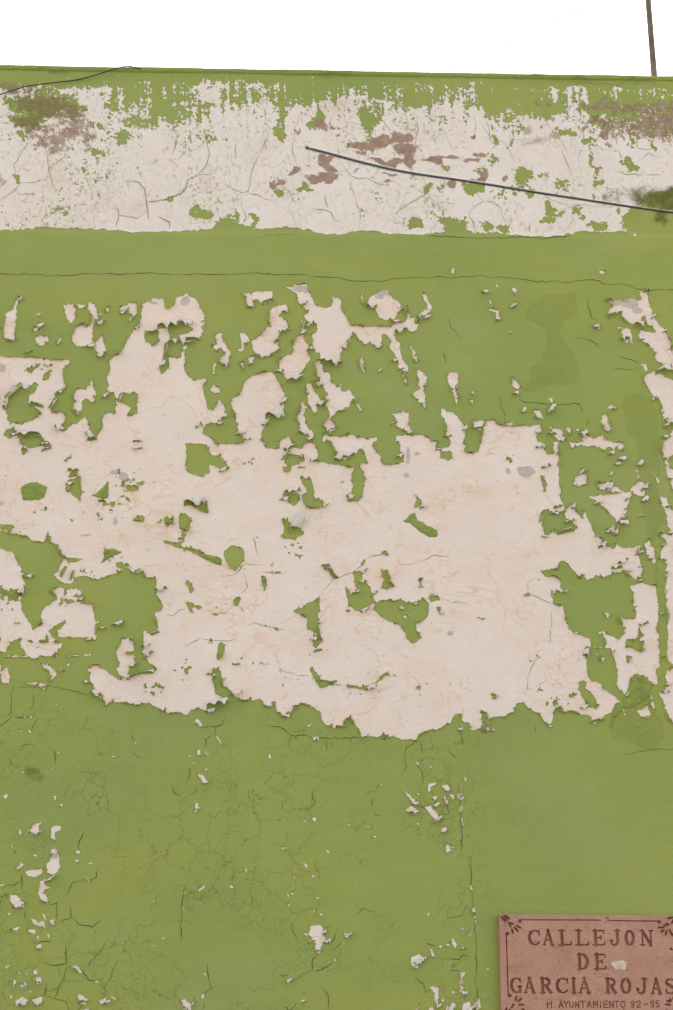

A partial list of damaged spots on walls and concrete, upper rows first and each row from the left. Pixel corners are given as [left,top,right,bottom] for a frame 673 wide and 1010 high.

water stain [0,81,97,155]
crack [115,109,389,238]
peeling [0,74,673,238]
crack [378,114,599,239]
water stain [526,96,673,143]
crack [0,272,672,343]
peeling [0,282,673,742]
peeling [404,782,464,854]
peeling [9,821,62,950]
crack [30,871,122,1010]
peeling [304,897,353,954]
crack [420,783,479,1010]